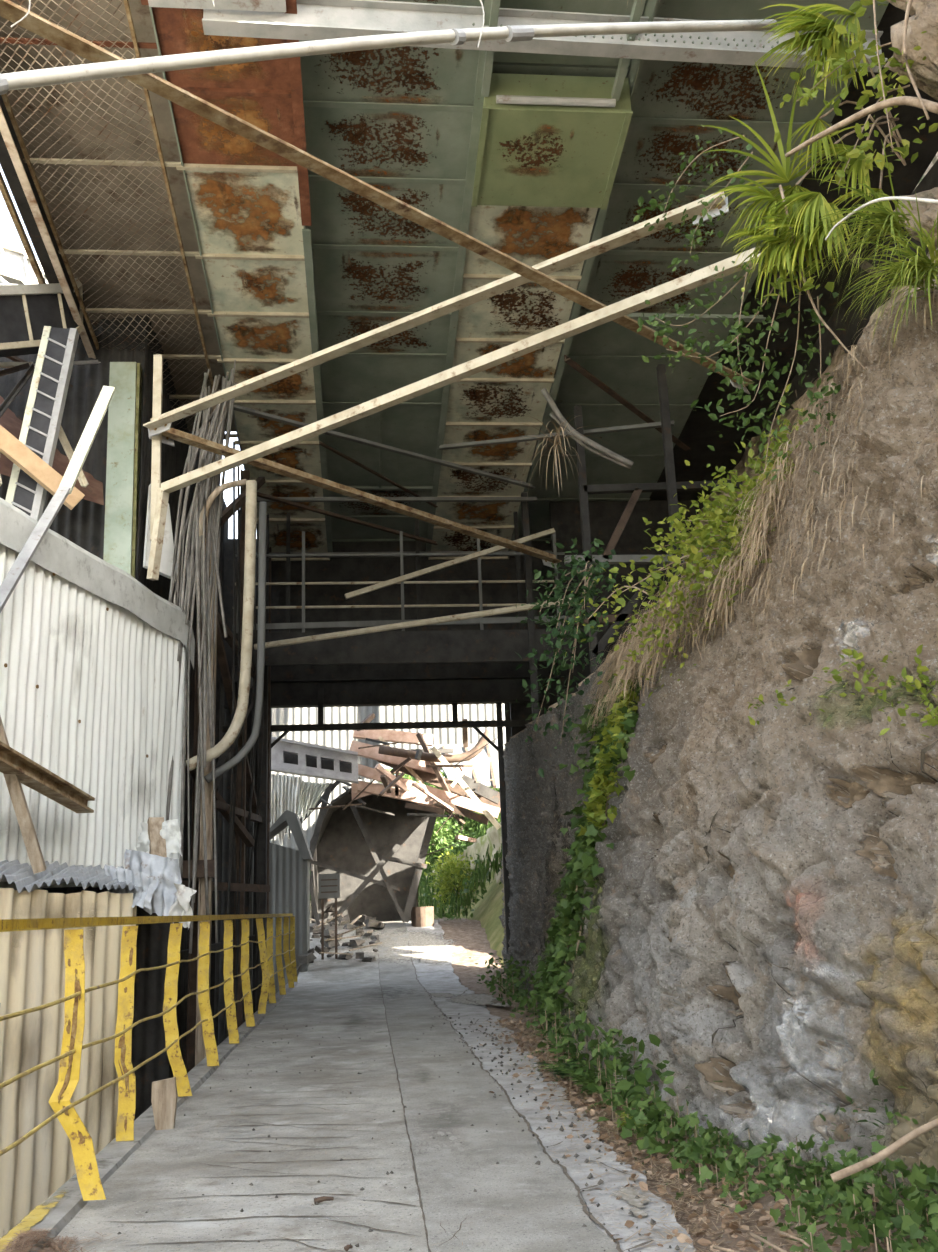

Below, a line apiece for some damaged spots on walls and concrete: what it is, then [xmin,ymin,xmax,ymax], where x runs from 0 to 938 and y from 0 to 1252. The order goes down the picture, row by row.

corrosion [183,11,260,82]
corrosion [182,117,298,252]
corrosion [316,46,448,353]
corrosion [499,125,573,176]
corrosion [494,206,589,271]
corrosion [636,290,696,312]
corrosion [598,62,811,302]
corrosion [227,266,323,552]
corrosion [441,283,560,551]